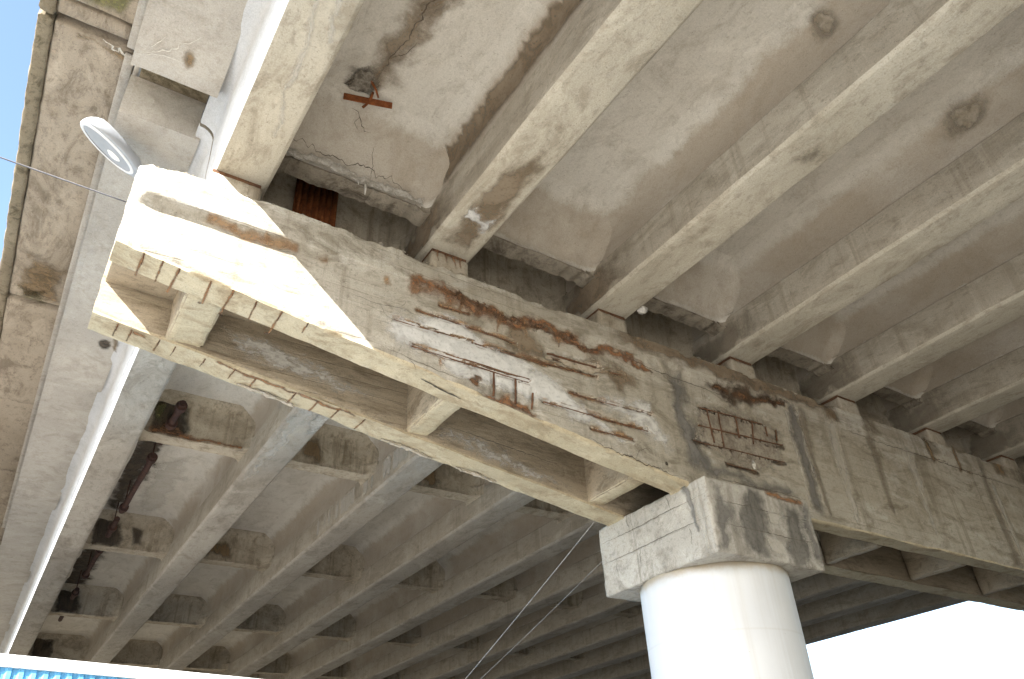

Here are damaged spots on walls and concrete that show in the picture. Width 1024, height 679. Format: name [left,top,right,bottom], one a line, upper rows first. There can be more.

spalling [344,68,379,93]
crack [373,0,455,86]
rust [292,178,339,227]
water stain [455,161,539,247]
spalling [393,303,627,377]
rust [410,275,653,373]
rust [200,359,364,429]
spalling [410,343,652,441]
water stain [621,332,836,567]
spalling [692,406,787,475]
water stain [56,401,242,613]